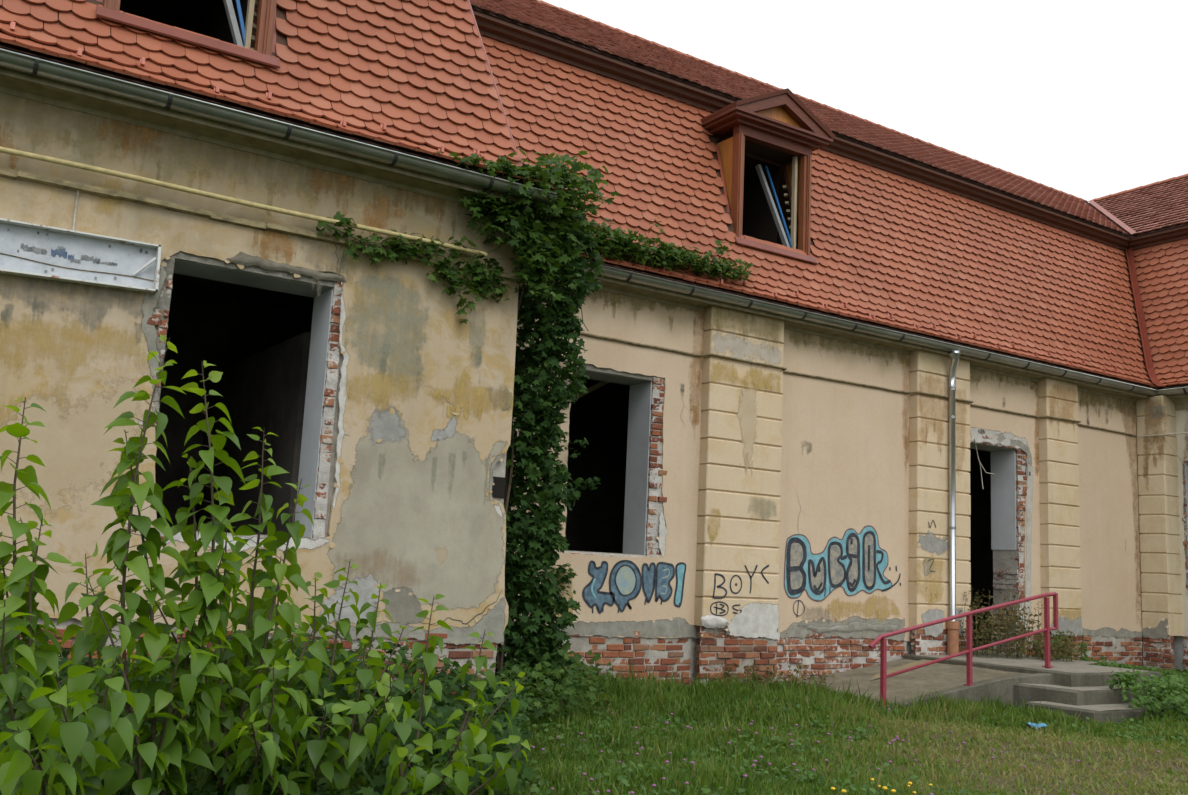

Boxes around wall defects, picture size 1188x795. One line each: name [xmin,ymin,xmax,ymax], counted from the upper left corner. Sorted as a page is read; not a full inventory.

peeling [0,251,508,645]
flaking render [564,364,667,557]
spalling [554,593,905,641]
spalling [922,608,965,637]
flaking render [970,427,1034,630]